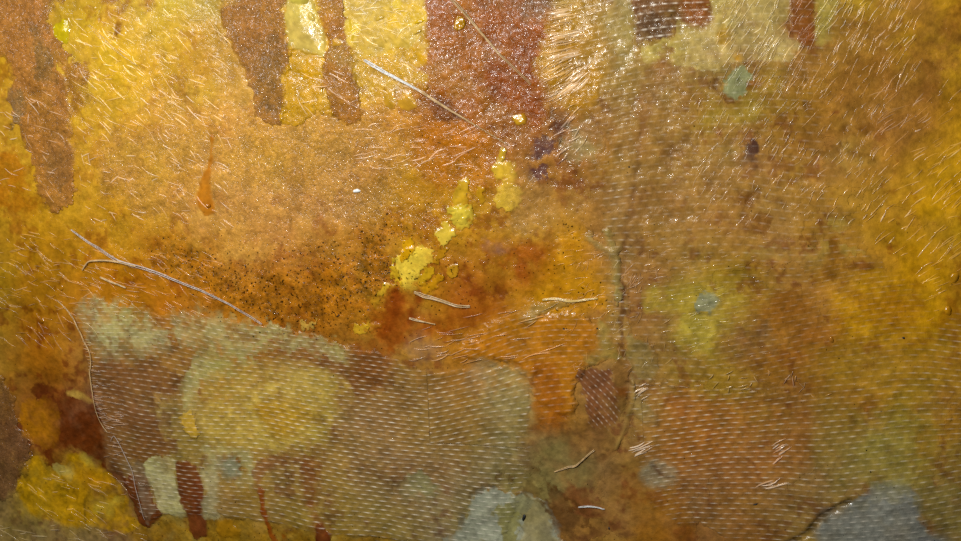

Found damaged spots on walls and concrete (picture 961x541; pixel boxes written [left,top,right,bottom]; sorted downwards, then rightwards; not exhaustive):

rust [0,141,46,220]
rust [395,0,550,208]
damp [721,186,774,236]
damp [745,132,762,155]
damp [784,17,961,338]
damp [639,274,779,372]